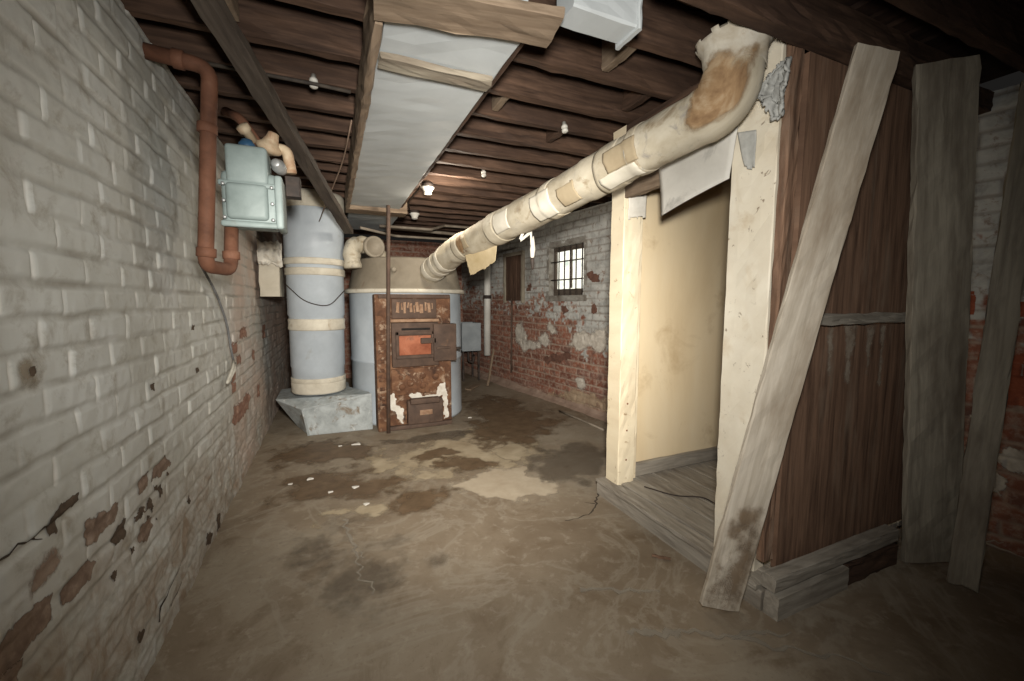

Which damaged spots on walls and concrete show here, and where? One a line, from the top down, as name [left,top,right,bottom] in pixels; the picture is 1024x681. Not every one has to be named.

spalling [544,351,571,365]
water stain [548,389,608,411]
water stain [268,396,563,527]
crack [0,516,59,561]
peeling [46,492,79,536]
peeling [84,455,171,555]
spalling [206,513,221,545]
peeling [0,548,96,681]